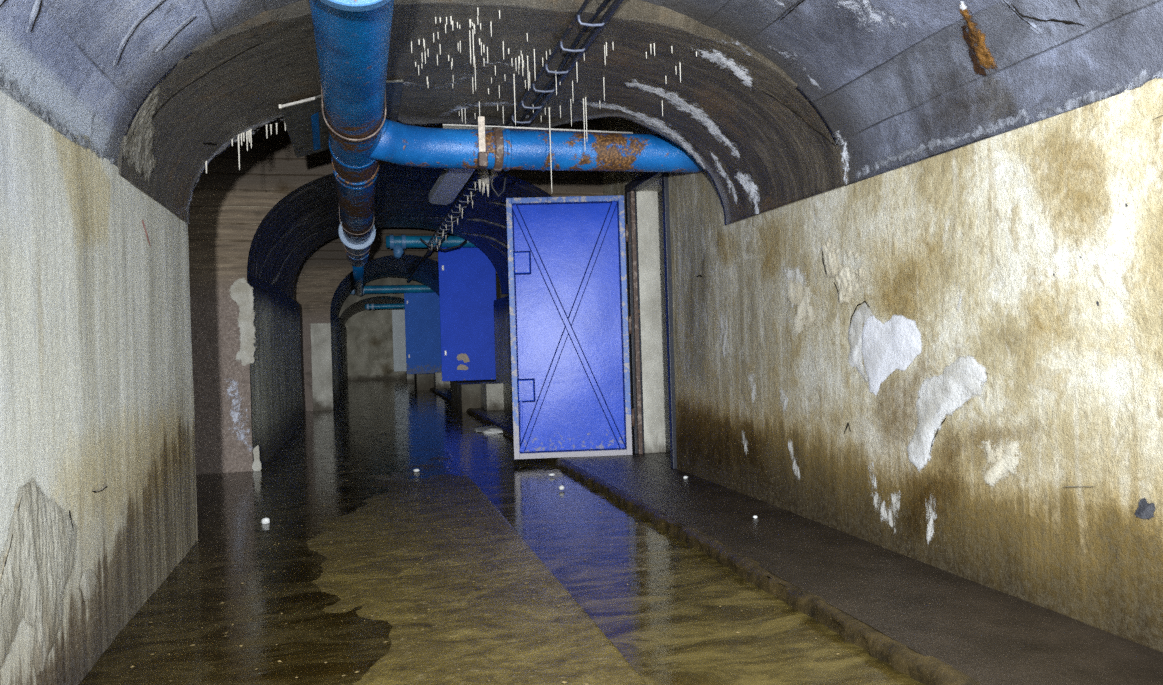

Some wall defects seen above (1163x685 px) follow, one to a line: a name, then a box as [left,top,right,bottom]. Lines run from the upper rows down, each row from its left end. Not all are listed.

crack [0,0,42,32]
crack [112,0,197,66]
rust [959,1,997,76]
crack [1000,0,1084,34]
efflorescence [580,79,760,214]
flaking render [229,277,257,366]
spalling [821,237,922,396]
spalling [906,355,988,472]
damp [788,440,800,480]
efflorescence [868,462,901,532]
damp [925,493,937,542]
flaking render [0,477,97,675]